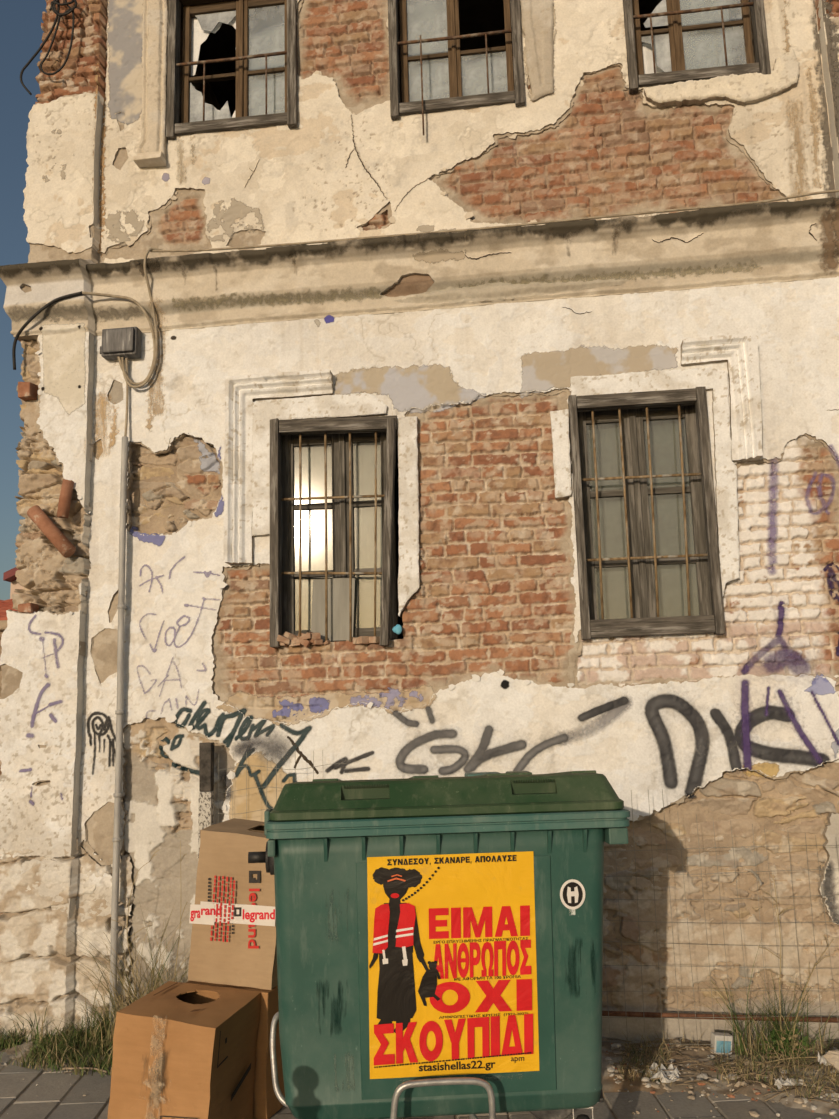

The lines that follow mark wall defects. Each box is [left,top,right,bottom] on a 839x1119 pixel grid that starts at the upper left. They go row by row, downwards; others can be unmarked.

spalling [35,0,144,131]
spalling [297,0,390,115]
spalling [815,0,839,32]
crack [345,115,434,211]
spalling [417,64,788,233]
spalling [28,173,266,277]
spalling [382,249,465,297]
spalling [9,323,91,615]
spalling [127,433,224,546]
spalling [212,345,839,726]
spalling [602,729,839,1044]